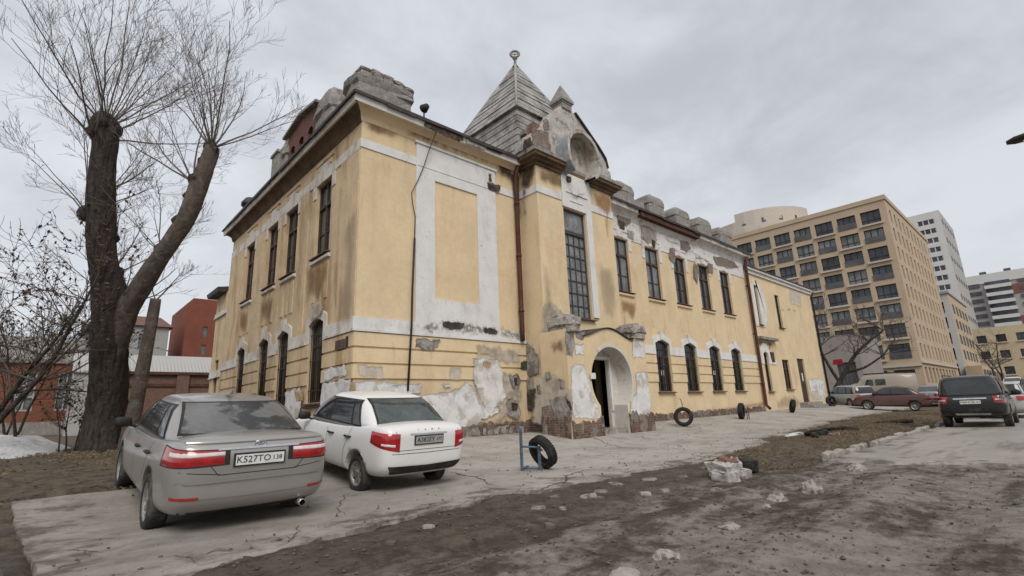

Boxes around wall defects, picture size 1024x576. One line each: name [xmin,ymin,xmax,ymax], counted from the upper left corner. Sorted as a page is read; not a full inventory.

spalling [523,119,551,151]
spalling [617,214,657,248]
spalling [669,241,691,263]
spalling [693,256,738,283]
peeling [320,331,600,437]
peeling [629,371,651,416]
peeling [808,378,825,400]